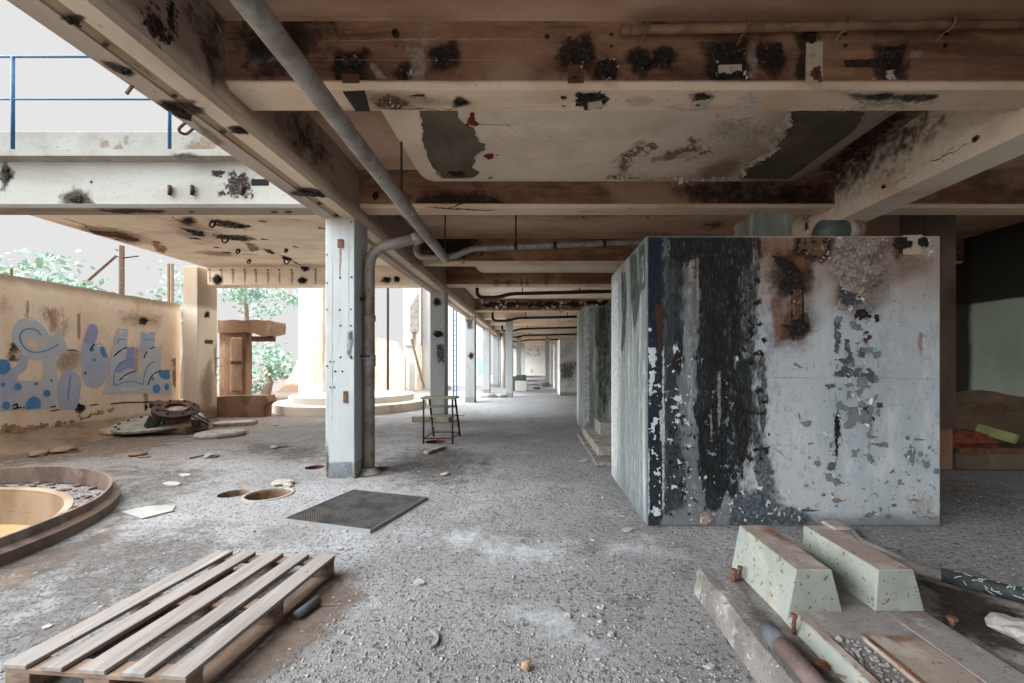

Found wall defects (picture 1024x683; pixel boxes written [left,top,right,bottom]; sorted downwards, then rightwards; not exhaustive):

water stain [141,0,179,50]
spalling [437,170,471,179]
peeling [606,112,793,184]
crack [895,142,973,184]
water stain [583,237,812,525]
spalling [648,235,940,525]